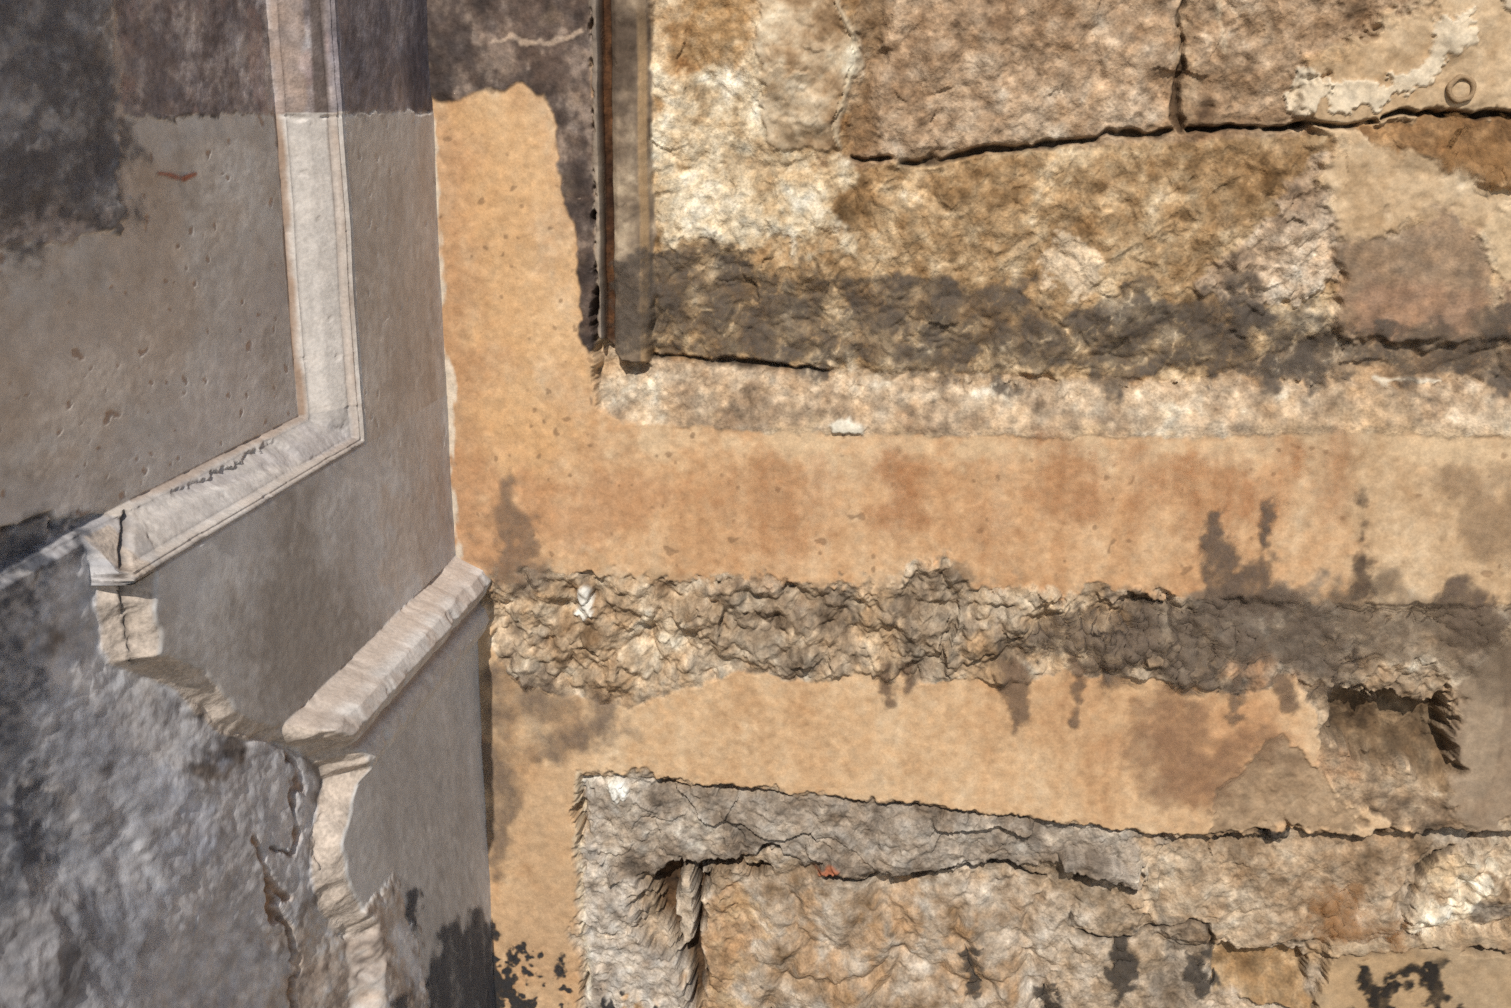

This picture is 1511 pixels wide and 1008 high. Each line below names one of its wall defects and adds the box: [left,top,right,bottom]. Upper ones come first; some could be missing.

crack [851,0,1380,167]
spalling [1284,5,1511,189]
damp [1227,272,1330,368]
crack [0,510,55,532]
peeling [574,585,595,621]
damp [879,662,914,707]
damp [998,660,1030,732]
damp [1027,502,1511,798]
peeling [608,779,629,804]
crack [251,749,304,1008]
spalling [815,865,840,877]
spalling [655,857,767,1004]